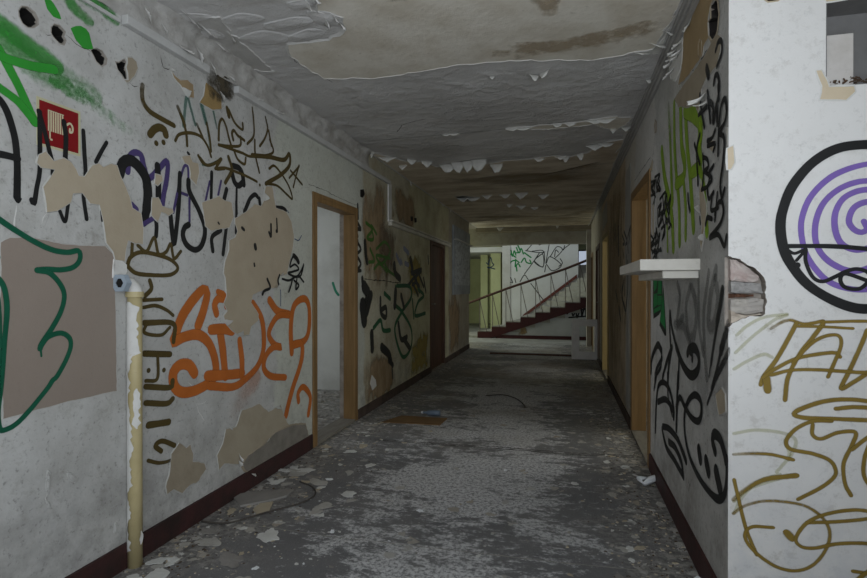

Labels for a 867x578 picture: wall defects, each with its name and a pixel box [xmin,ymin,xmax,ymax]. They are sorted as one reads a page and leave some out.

spalling [90,48,138,84]
peeling [285,0,723,113]
peeling [98,0,633,231]
peeling [35,150,174,278]
peeling [201,186,294,337]
spalling [728,259,764,323]
peeling [165,442,206,495]
peeling [216,403,309,477]
peeling [266,465,331,498]